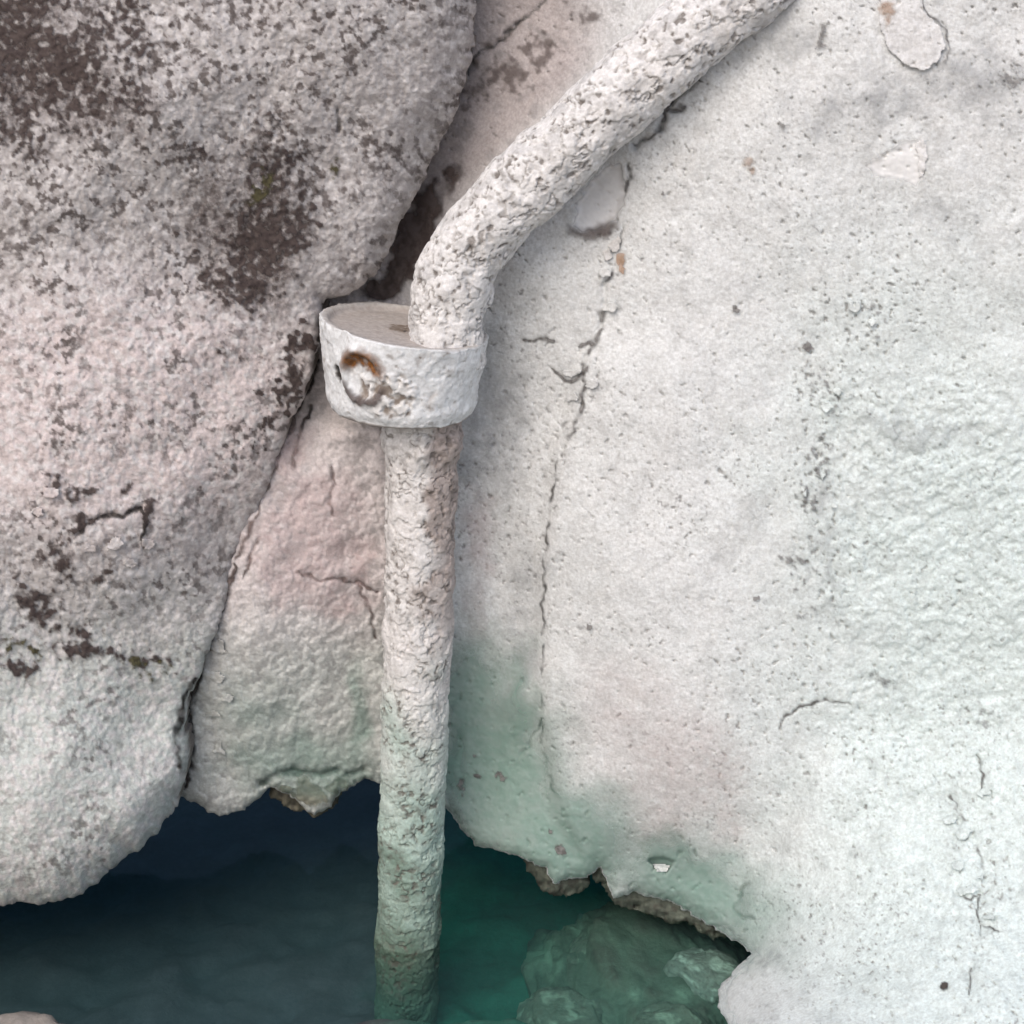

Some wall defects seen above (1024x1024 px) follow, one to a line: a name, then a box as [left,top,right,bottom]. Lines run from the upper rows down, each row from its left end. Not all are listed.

mould [0,0,172,169]
spalling [869,140,928,185]
mould [172,102,323,320]
mould [240,318,318,454]
corrosion [341,352,381,376]
corrosion [343,382,383,406]
crack [79,506,148,540]
crack [523,311,605,670]
water stain [0,473,177,682]
crack [297,571,378,639]
crack [780,699,842,725]
spalling [520,857,727,941]